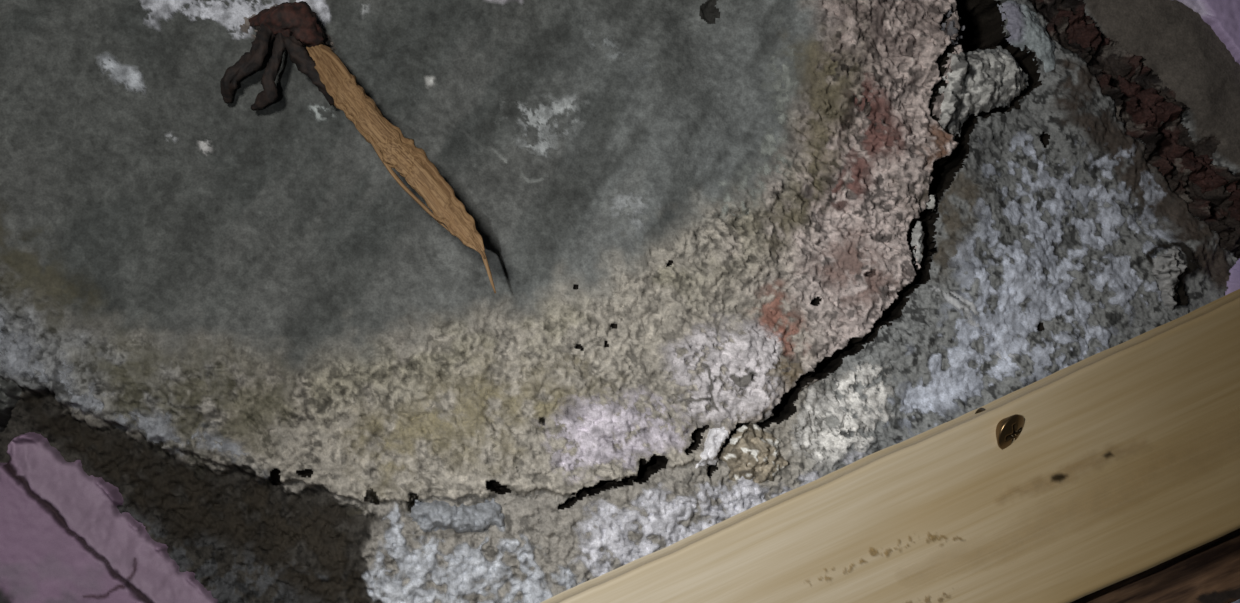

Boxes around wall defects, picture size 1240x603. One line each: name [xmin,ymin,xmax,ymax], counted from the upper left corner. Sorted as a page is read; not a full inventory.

leakage [100,55,145,90]
leakage [199,140,212,154]
leakage [518,97,578,157]
spalling [1030,0,1240,259]
crack [558,0,1042,510]
leakage [576,42,1230,577]
spalling [1146,242,1199,310]
leakage [0,313,49,382]
leakage [535,391,687,471]
spalling [268,468,282,485]
spalling [296,469,313,478]
leakage [42,364,585,603]